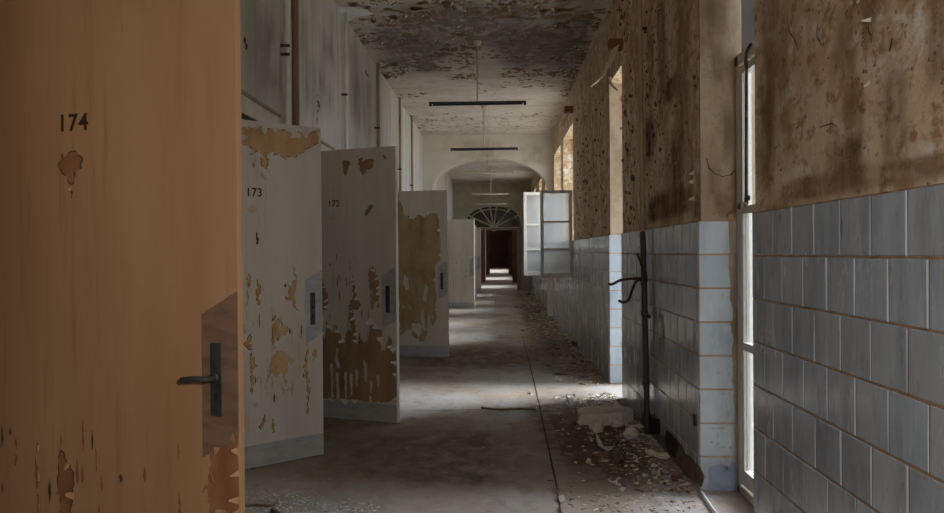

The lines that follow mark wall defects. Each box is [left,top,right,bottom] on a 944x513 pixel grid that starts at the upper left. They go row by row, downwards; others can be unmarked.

peeling [347,0,633,97]
peeling [242,95,321,181]
peeling [342,153,387,177]
damp [900,156,944,176]
peeling [204,194,441,513]